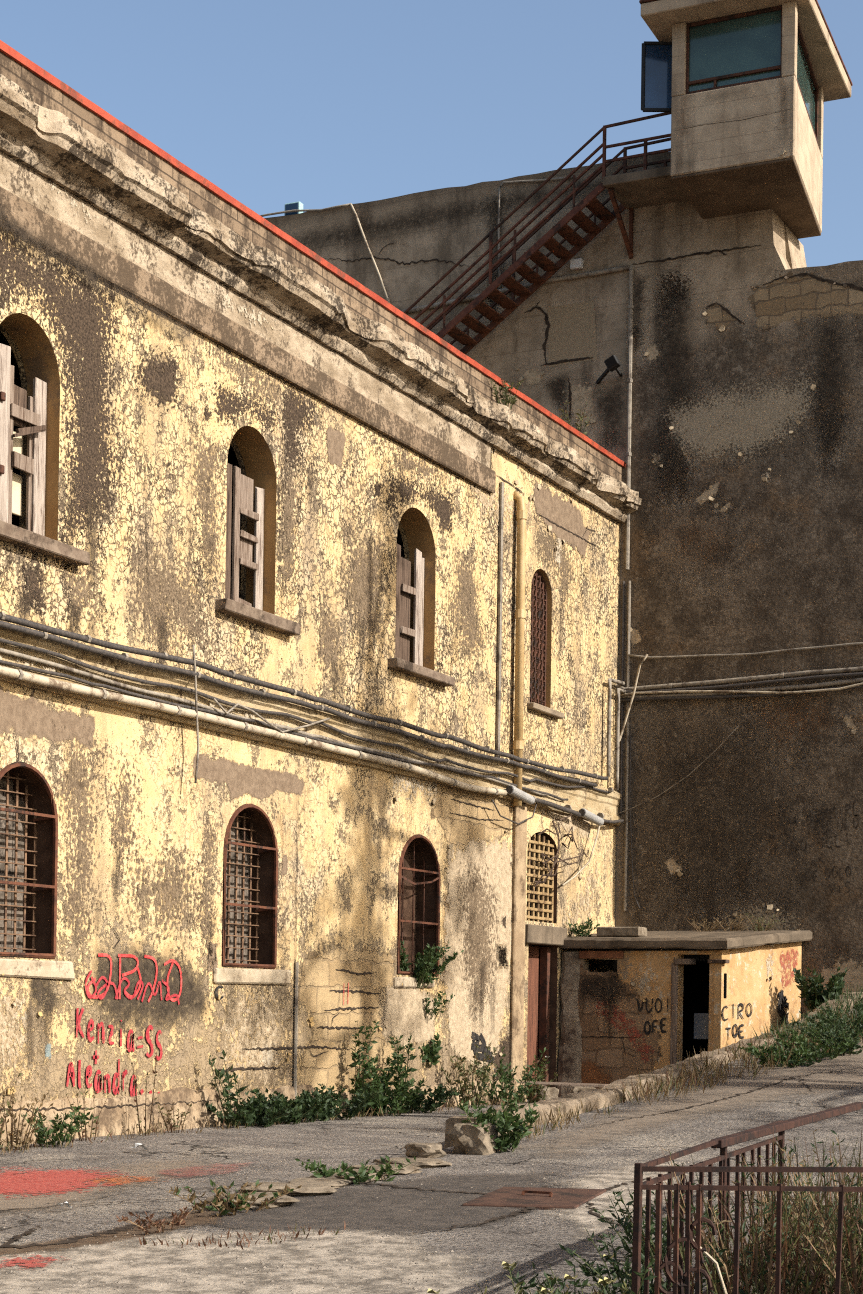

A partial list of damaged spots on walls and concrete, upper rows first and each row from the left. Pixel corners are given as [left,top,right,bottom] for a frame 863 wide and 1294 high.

peeling [49,180,98,223]
peeling [196,268,275,330]
crack [326,242,469,267]
spalling [748,269,863,333]
crack [763,273,863,291]
crack [525,301,593,417]
damp [0,206,346,665]
spalling [696,482,730,512]
spalling [207,772,514,1092]
damp [455,851,503,1024]
damp [492,1030,510,1083]
spalling [557,952,663,1097]